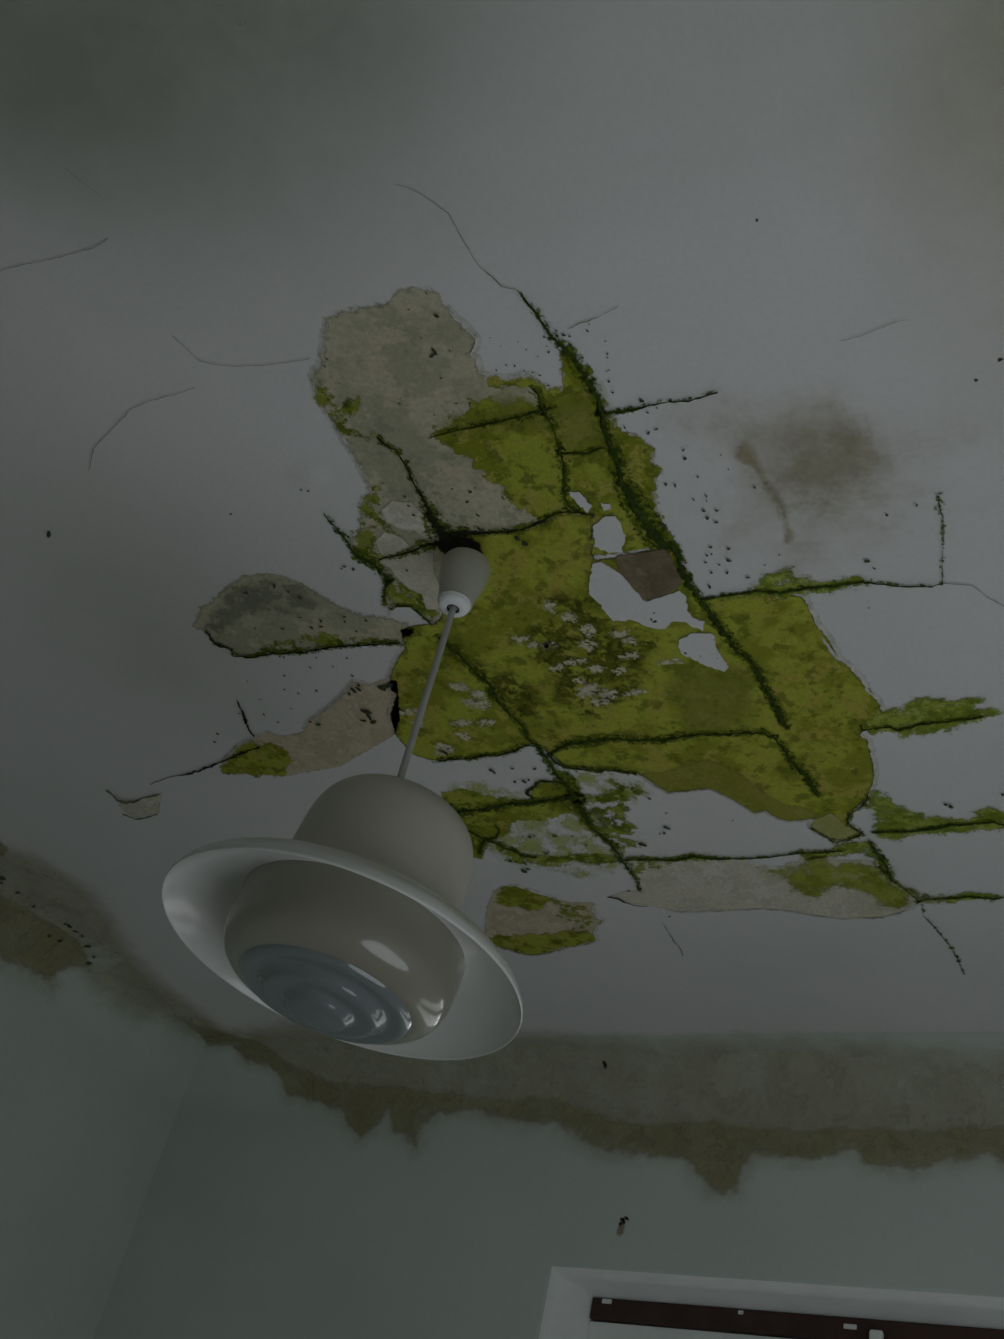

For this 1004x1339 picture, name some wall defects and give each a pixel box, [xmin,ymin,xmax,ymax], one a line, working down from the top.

peeling [105,789,161,820]
crack [150,701,260,785]
spalling [193,287,923,957]
crack [204,184,965,974]